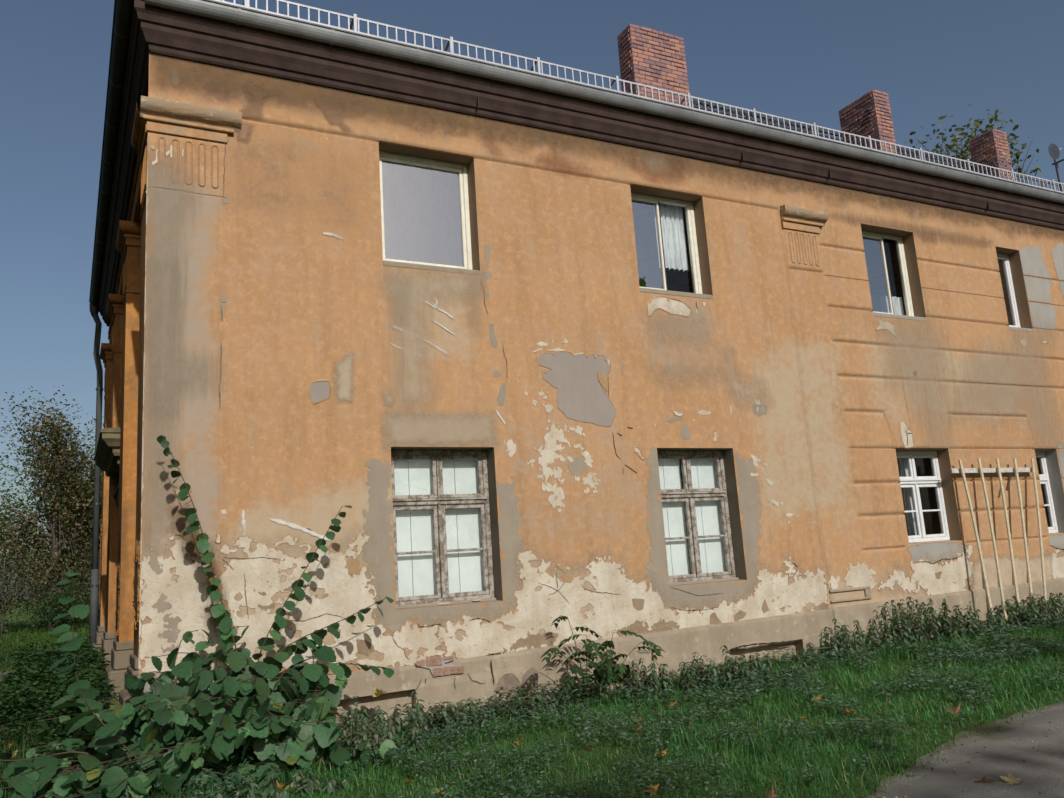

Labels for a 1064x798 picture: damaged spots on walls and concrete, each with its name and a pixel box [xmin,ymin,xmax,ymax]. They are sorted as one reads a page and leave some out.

peeling [646,296,706,318]
peeling [533,339,610,392]
peeling [115,352,974,677]
peeling [1049,534,1064,579]